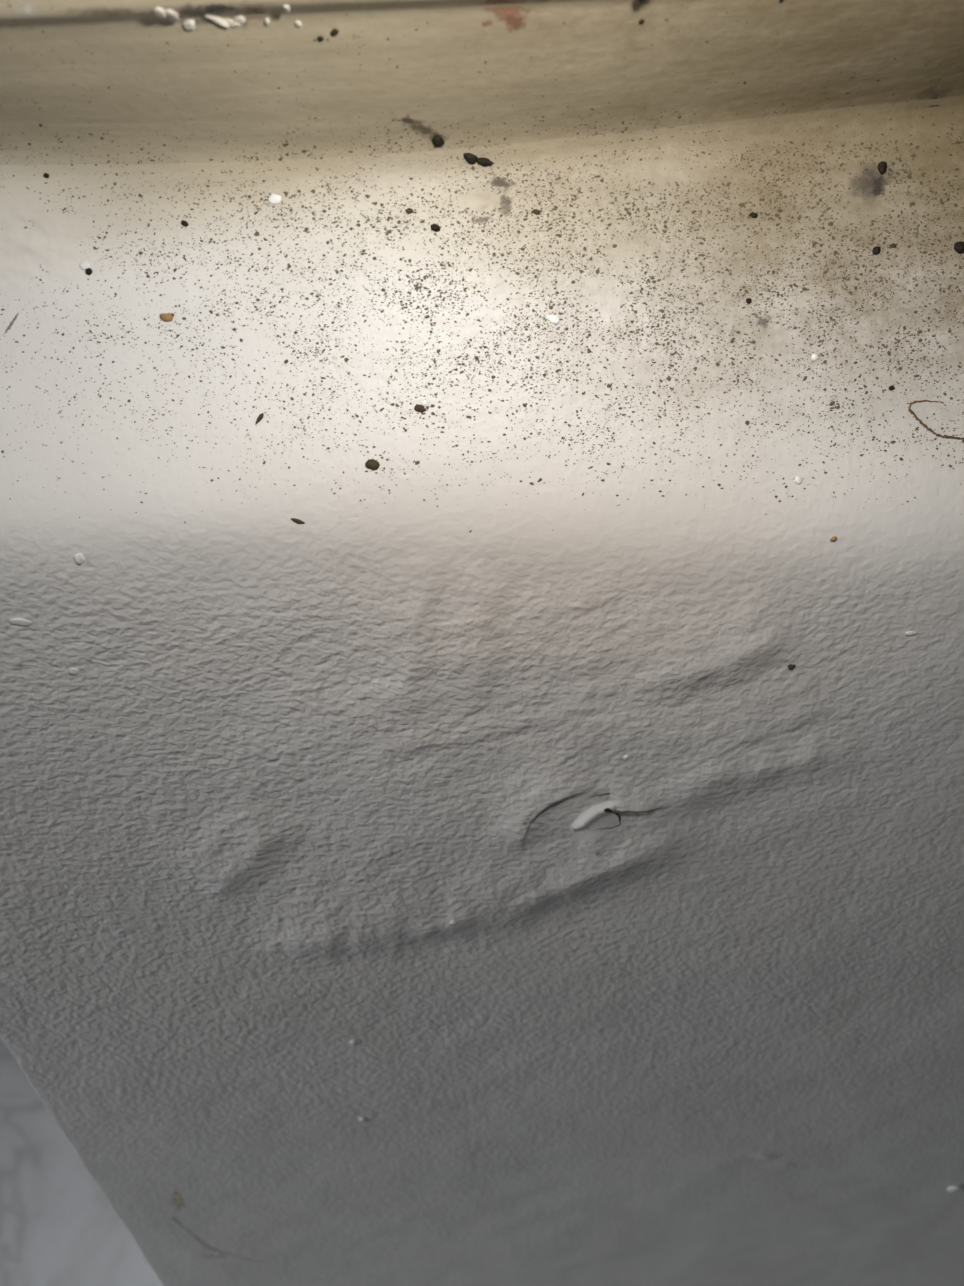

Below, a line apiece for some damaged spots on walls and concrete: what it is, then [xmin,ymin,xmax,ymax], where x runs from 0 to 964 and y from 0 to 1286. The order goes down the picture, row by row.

peeling [474,747,673,854]